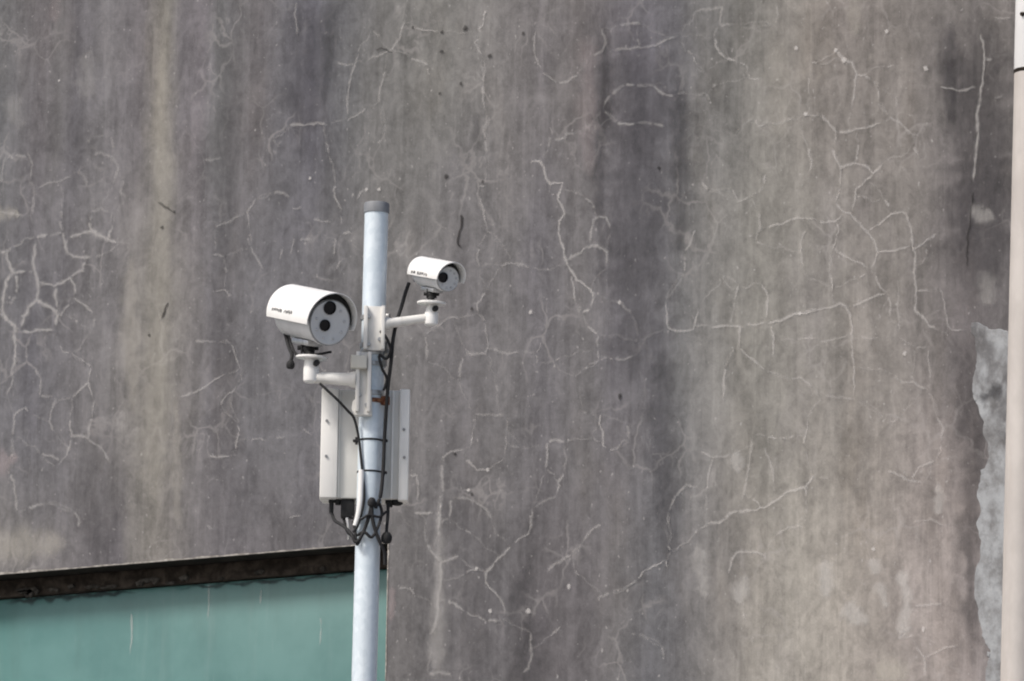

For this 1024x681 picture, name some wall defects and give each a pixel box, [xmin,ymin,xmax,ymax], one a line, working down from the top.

peeling [971,322,1008,681]